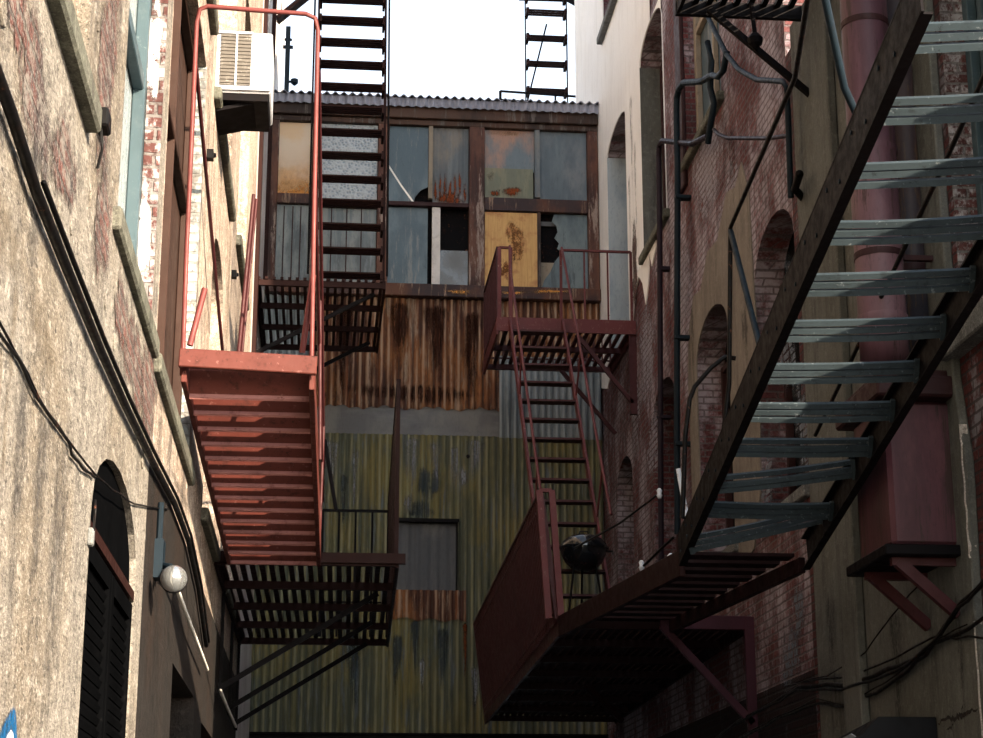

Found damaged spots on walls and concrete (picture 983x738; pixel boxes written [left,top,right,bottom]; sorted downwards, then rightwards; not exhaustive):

peeling [147,0,163,98]
corrosion [434,174,466,203]
corrosion [501,223,524,275]
corrosion [358,303,478,405]